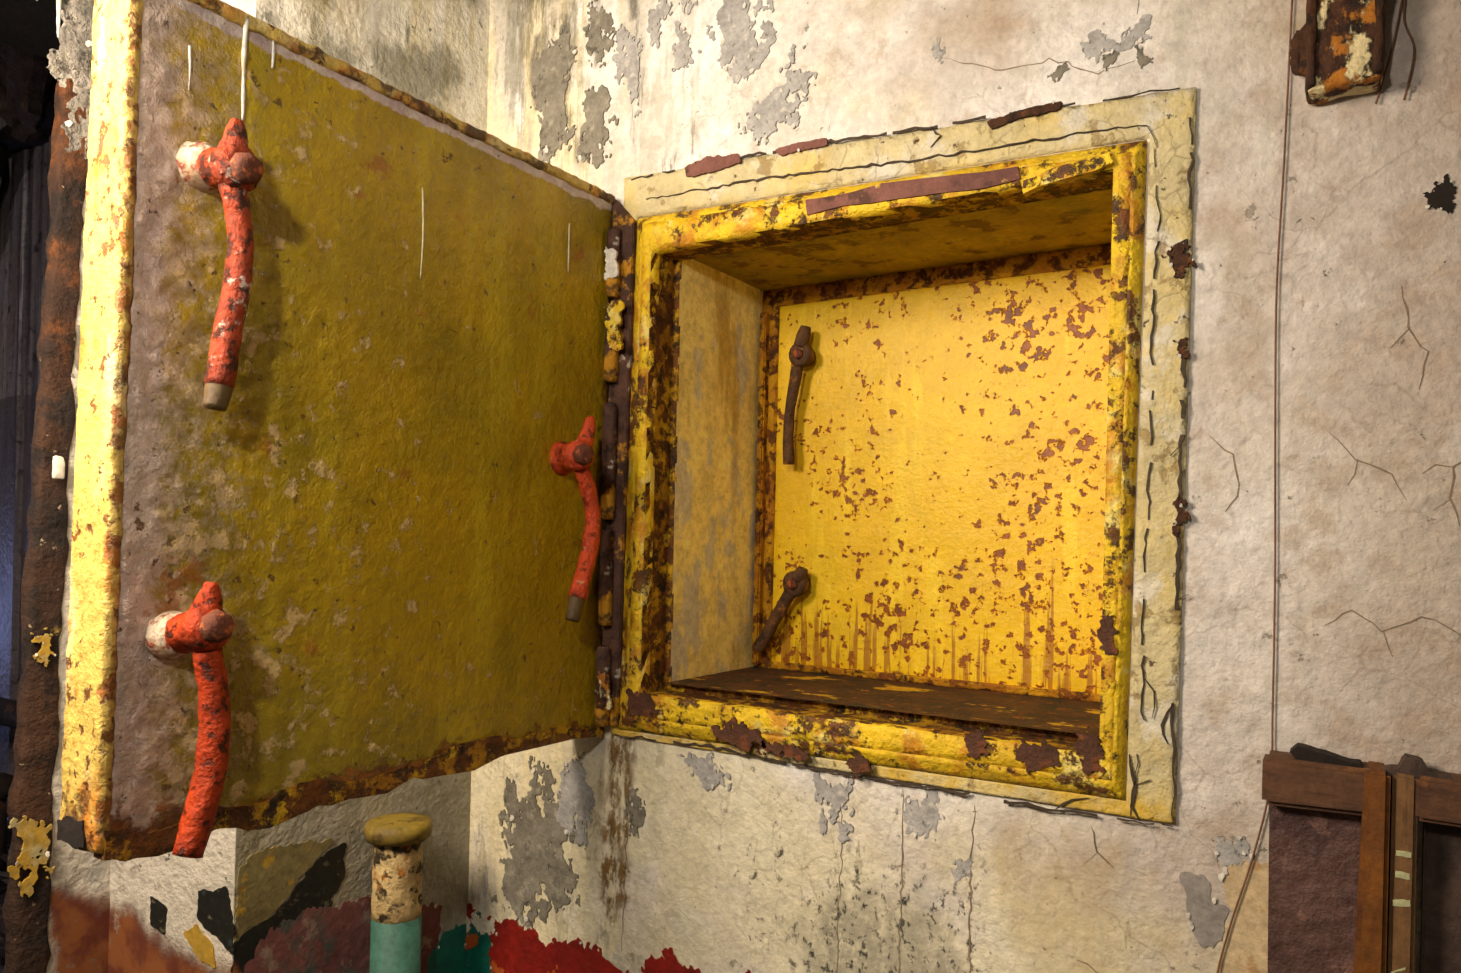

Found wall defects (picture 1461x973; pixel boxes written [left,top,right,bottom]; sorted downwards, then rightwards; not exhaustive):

peeling [530,0,828,169]
spalling [987,61,1070,130]
spalling [685,152,742,177]
peeling [1423,174,1456,214]
crack [1391,286,1429,388]
crack [1330,433,1461,526]
crack [1326,609,1461,657]
rust [93,822,180,862]
peeling [244,896,372,973]
rust [211,726,631,919]
peeling [421,752,701,973]
peeling [1179,835,1269,973]